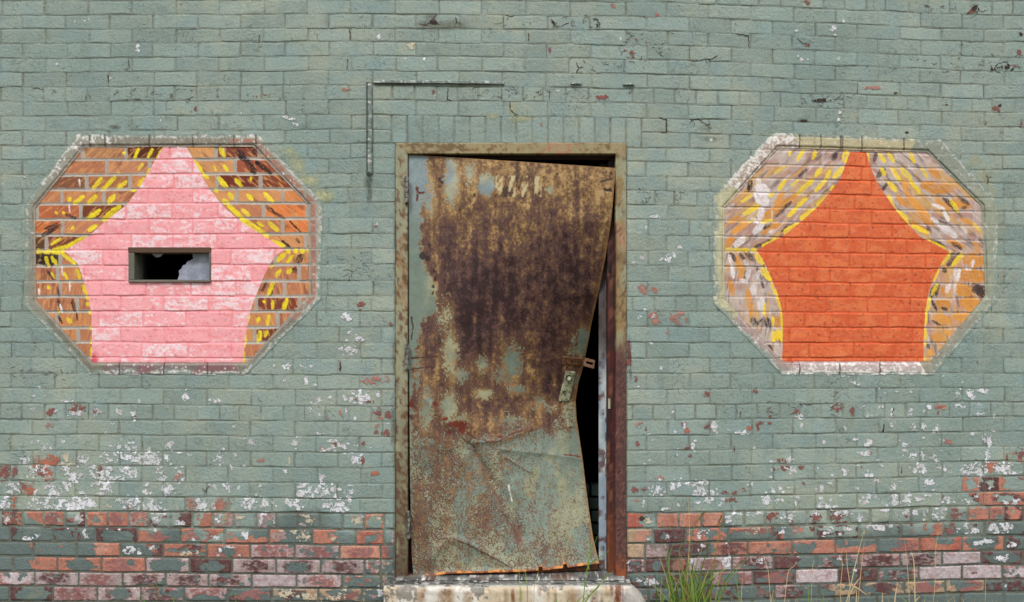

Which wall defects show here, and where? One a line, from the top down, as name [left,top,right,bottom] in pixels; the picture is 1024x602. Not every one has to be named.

peeling [637,283,687,334]
peeling [30,382,102,430]
peeling [273,355,393,476]
peeling [0,399,417,602]
peeling [623,381,1024,602]